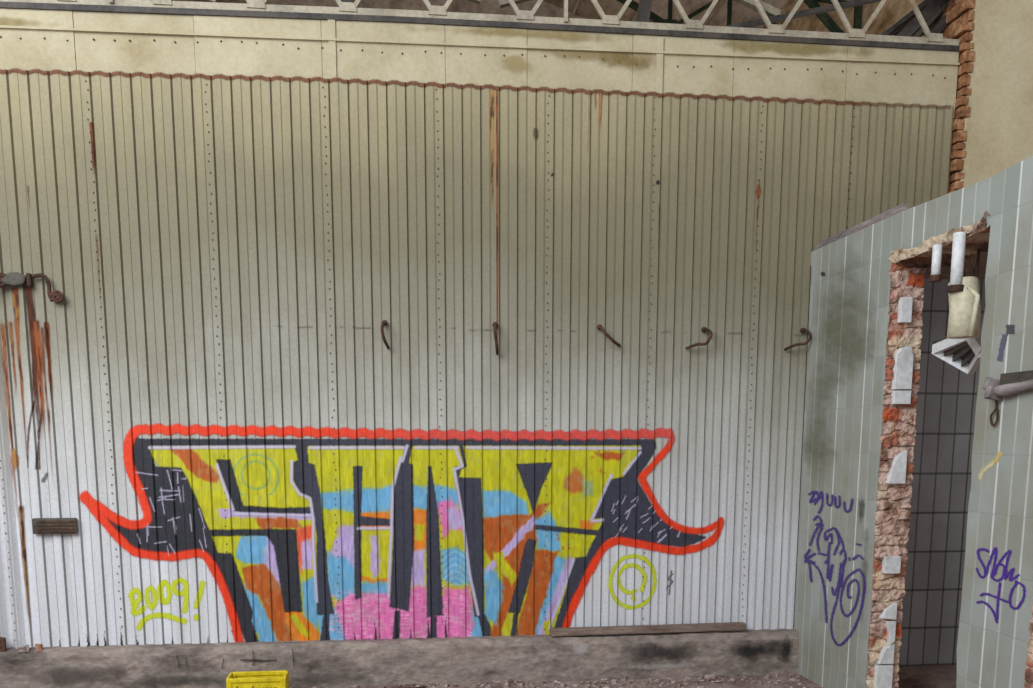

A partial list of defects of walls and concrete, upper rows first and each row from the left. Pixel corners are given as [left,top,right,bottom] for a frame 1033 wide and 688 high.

rust [0,68,874,312]
rust [1,286,52,479]
spalling [866,211,990,688]
rust [18,506,29,606]
leakage [627,644,687,669]
leakage [735,642,791,659]
spalling [1024,604,1033,688]